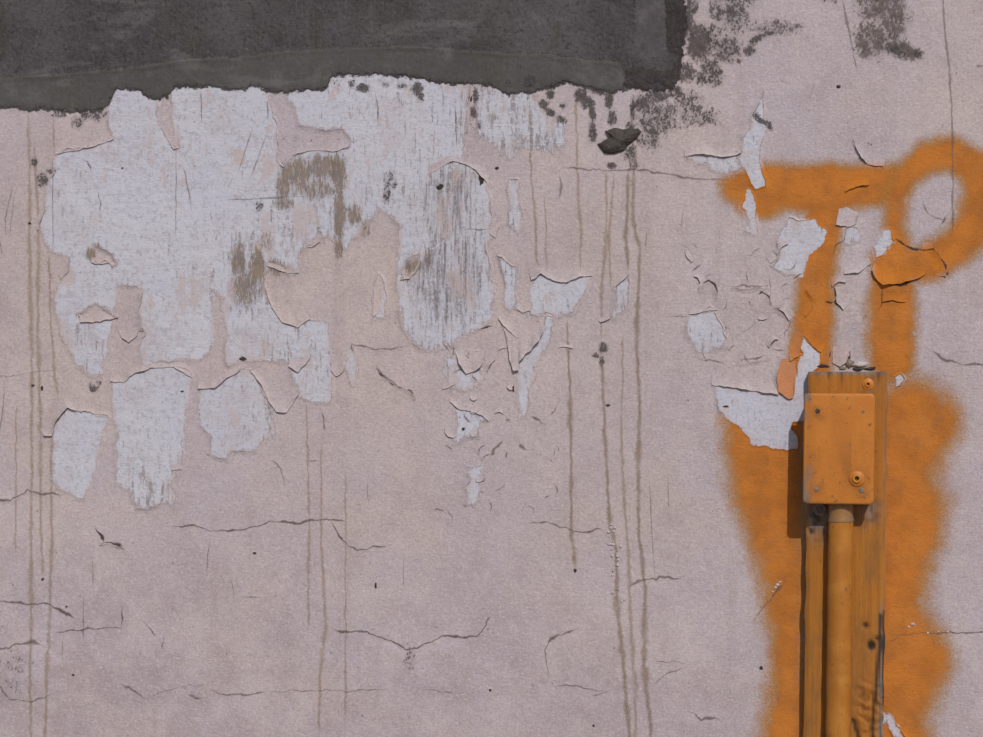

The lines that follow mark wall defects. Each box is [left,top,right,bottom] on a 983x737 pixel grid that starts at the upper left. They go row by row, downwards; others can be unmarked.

peeling [683,86,770,239]
peeling [767,215,829,279]
peeling [843,224,899,261]
peeling [28,73,634,514]
peeling [681,300,731,355]
peeling [711,330,827,453]
crack [0,489,59,504]
crack [173,519,385,550]
crack [5,601,123,631]
crack [336,618,489,650]